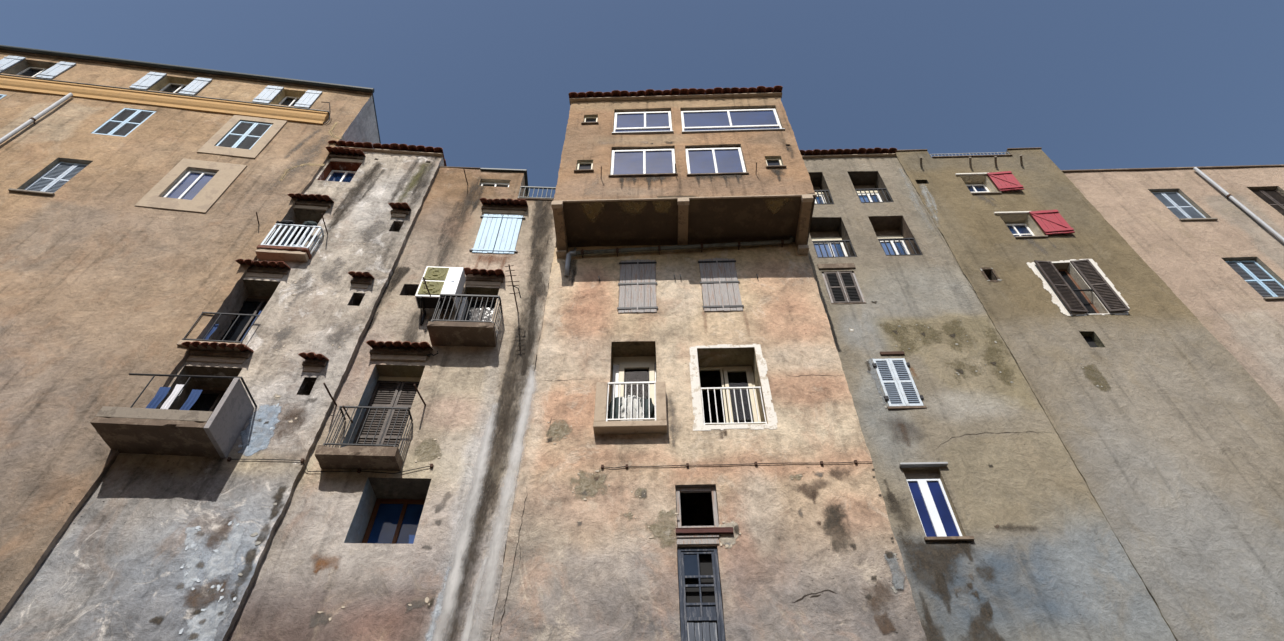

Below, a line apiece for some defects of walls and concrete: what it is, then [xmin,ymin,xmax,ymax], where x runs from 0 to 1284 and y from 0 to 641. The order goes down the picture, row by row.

leakage [391,160,433,211]
peeling [238,394,281,456]
leakage [425,197,553,641]
peeling [176,486,286,641]
leakage [798,470,856,551]
leakage [884,480,1004,641]